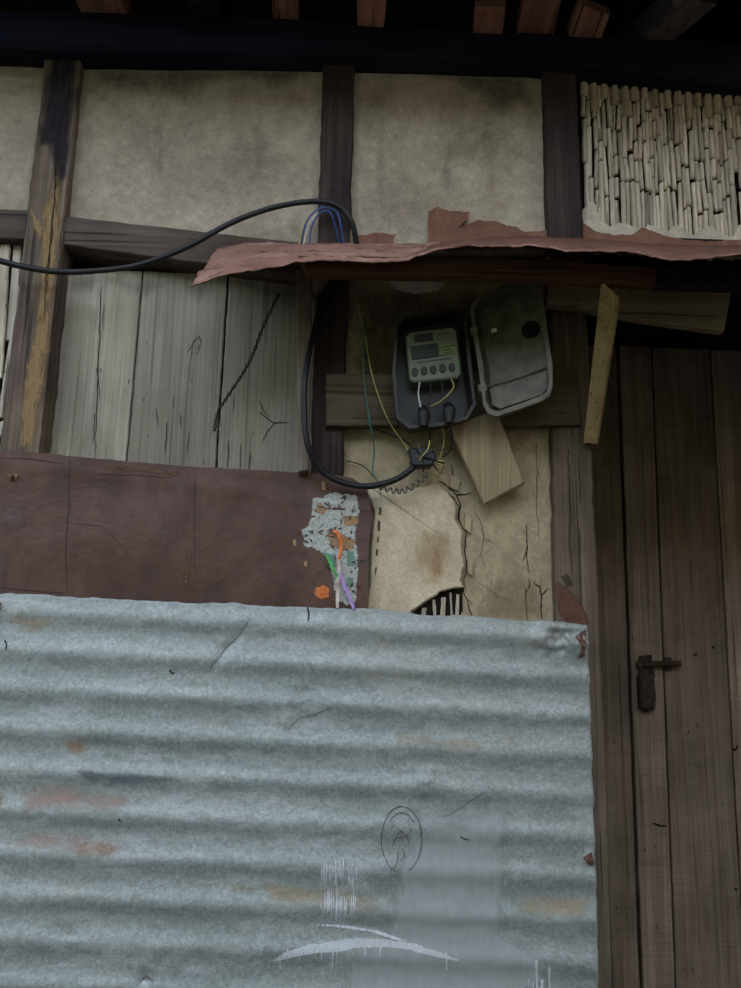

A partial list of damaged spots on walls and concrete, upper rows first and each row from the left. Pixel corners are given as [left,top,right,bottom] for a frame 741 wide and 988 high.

corrosion [315,585,329,599]
peeling [293,475,474,616]
crack [439,445,549,620]
crack [567,450,581,574]